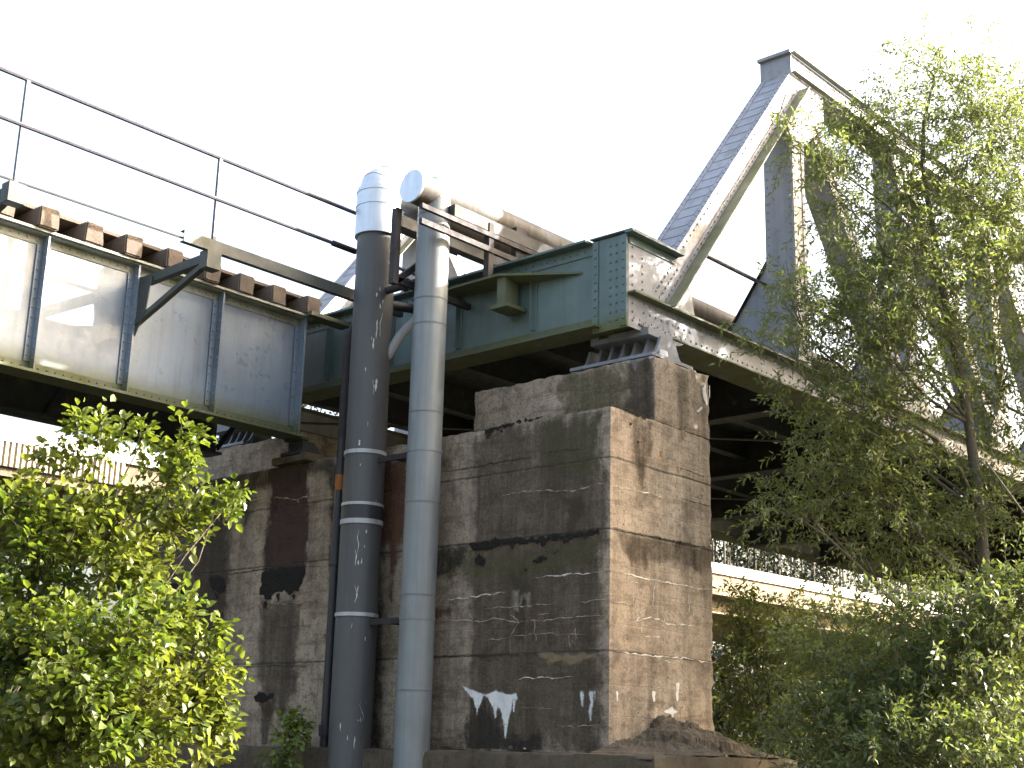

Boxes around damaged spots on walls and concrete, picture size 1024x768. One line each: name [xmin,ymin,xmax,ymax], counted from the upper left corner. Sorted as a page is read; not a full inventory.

spalling [484,416,543,439]
water stain [626,356,654,479]
crack [502,482,711,506]
water stain [127,458,336,744]
peeling [259,566,305,609]
water stain [372,594,382,746]
water stain [437,413,606,751]
crack [438,592,606,680]
spalling [469,528,599,571]
crack [540,569,715,663]